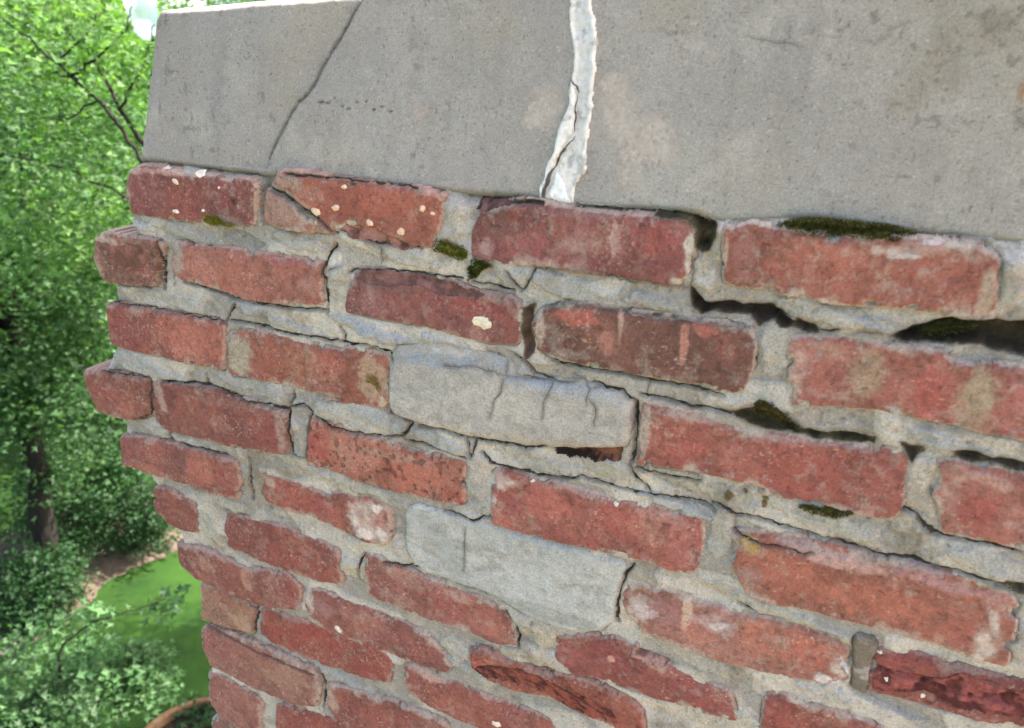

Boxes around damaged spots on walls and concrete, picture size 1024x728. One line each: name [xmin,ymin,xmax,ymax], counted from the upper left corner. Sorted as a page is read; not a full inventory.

crack [273,0,363,152]
crack [539,0,599,204]
crack [949,234,1004,295]
crack [105,355,1016,591]
spalling [474,664,618,723]
spalling [872,668,1024,717]